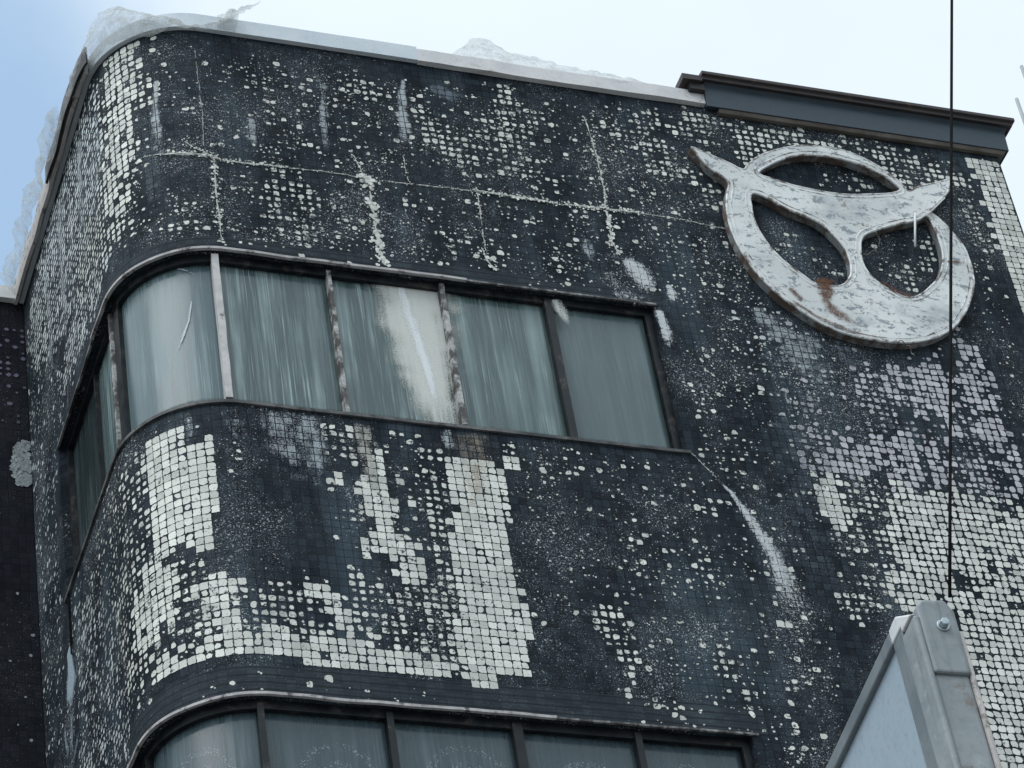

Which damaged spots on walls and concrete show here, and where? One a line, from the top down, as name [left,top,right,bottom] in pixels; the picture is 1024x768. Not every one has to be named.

peeling [0,36,659,768]
water stain [375,285,459,449]
peeling [209,55,1024,768]
water stain [723,485,808,613]